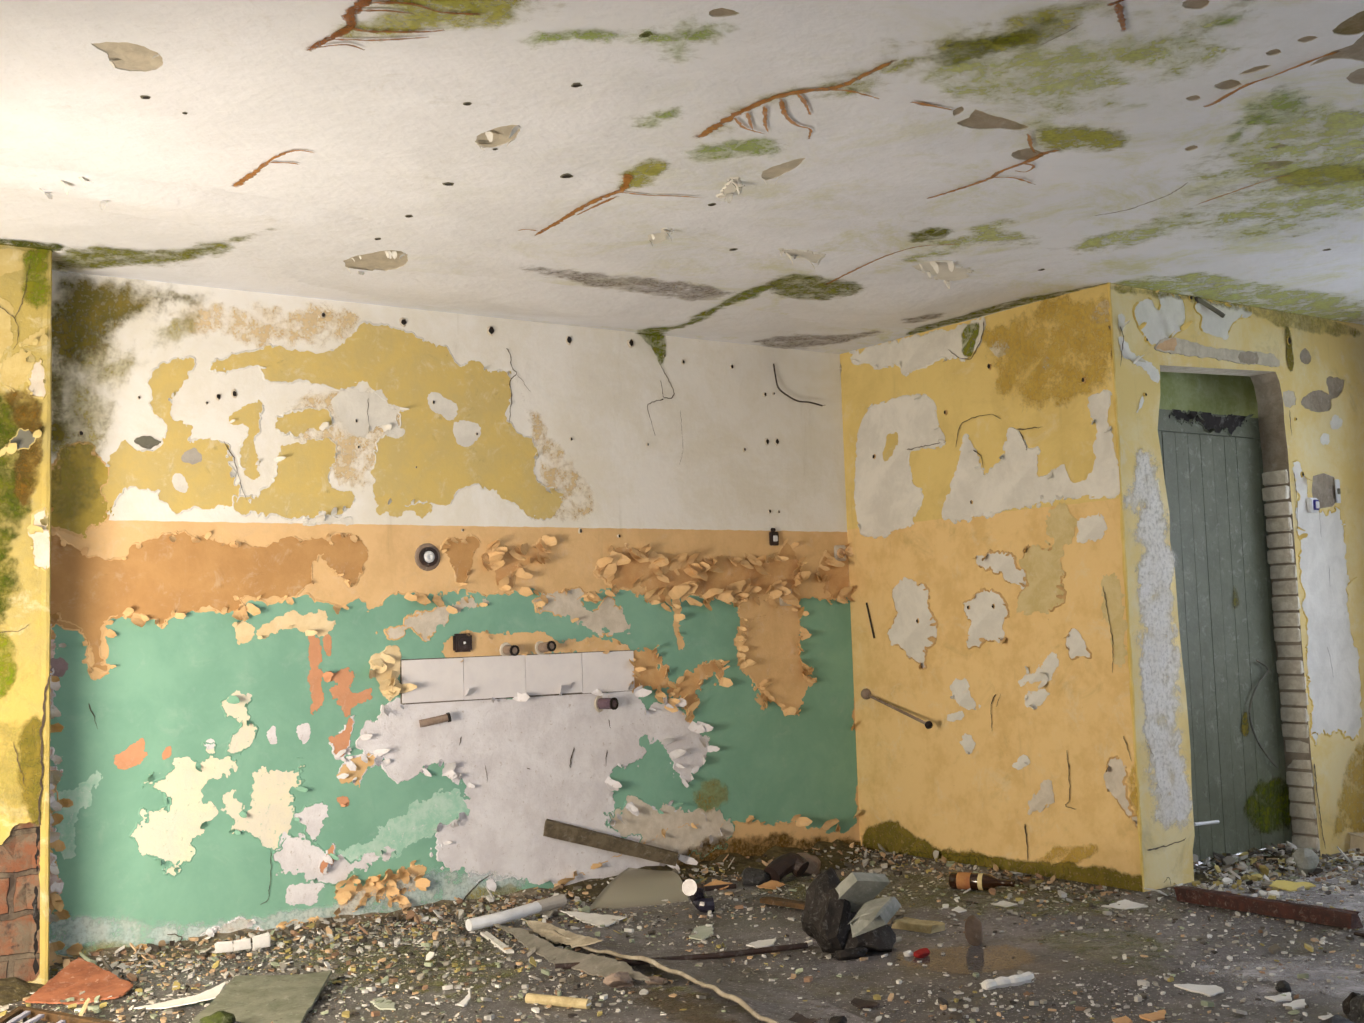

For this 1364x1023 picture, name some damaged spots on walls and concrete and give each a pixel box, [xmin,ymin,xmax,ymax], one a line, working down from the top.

rust [307,0,480,51]
rust [697,61,893,139]
spalling [1182,0,1210,9]
spalling [1214,49,1282,90]
spalling [1297,11,1364,85]
rust [927,134,1059,199]
rust [518,174,700,236]
peeling [0,317,1192,982]
crack [13,677,49,826]